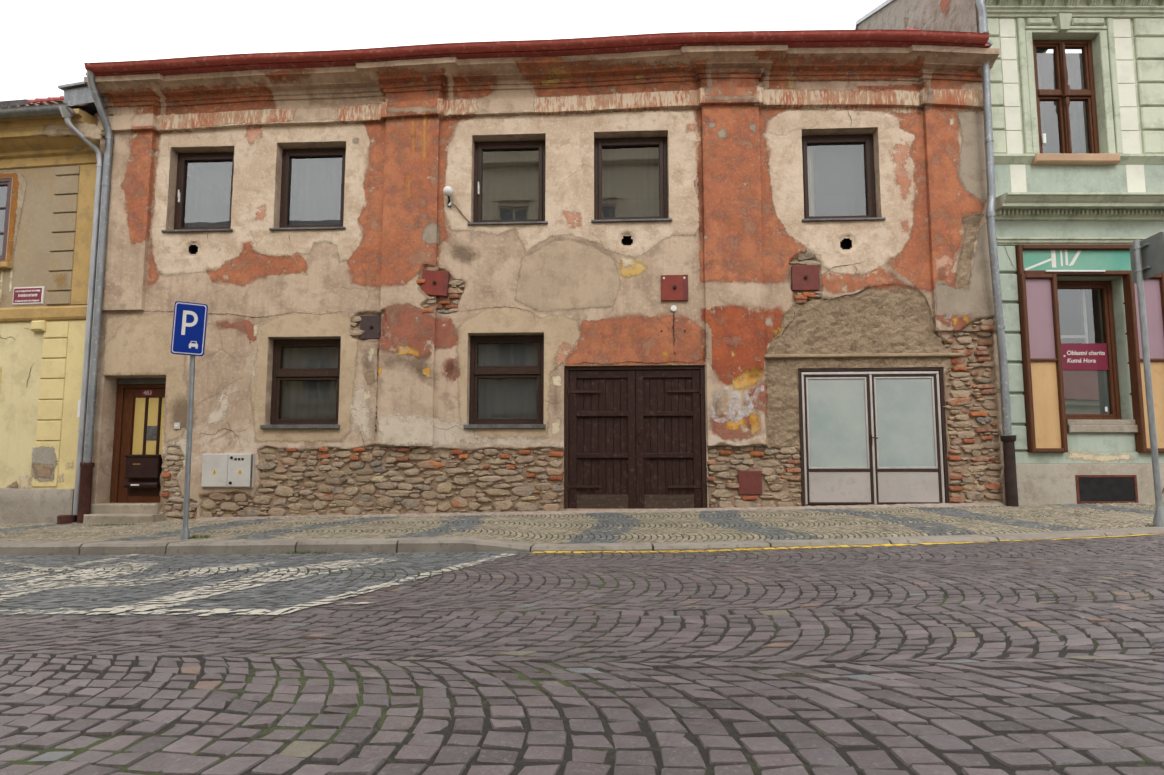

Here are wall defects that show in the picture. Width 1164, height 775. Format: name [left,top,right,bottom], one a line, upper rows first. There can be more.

peeling [34,68,310,286]
peeling [347,68,496,381]
peeling [517,50,1004,508]
spalling [7,446,73,489]